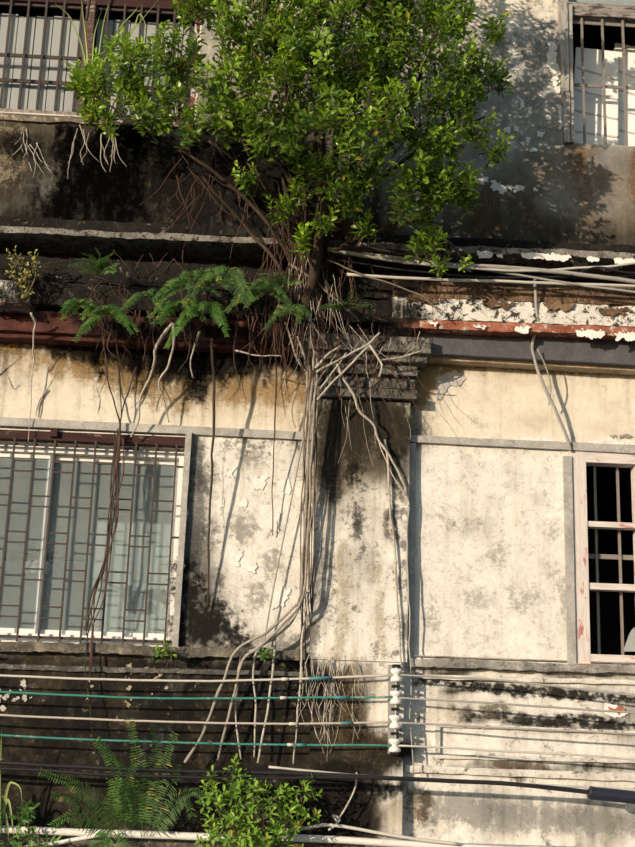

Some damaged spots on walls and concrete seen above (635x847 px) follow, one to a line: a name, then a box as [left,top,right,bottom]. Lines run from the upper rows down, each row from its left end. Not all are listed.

peeling [544,41,561,94]
peeling [503,126,545,152]
damp [0,115,320,229]
flaking render [477,250,635,273]
flaking render [480,298,515,310]
flaking render [543,298,574,313]
flaking render [600,305,633,319]
damp [32,273,433,412]
peeling [575,328,635,341]
damp [166,442,254,648]
peeling [0,679,32,711]
damp [308,669,635,837]